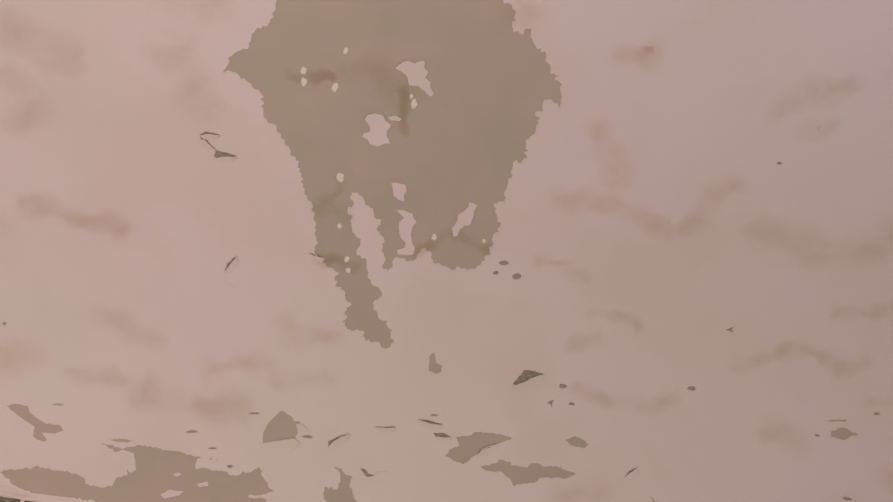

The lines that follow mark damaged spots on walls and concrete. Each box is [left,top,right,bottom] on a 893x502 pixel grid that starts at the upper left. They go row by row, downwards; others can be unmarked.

peeling [200,132,237,163]
peeling [220,0,564,350]
peeling [512,370,544,392]
peeling [4,401,65,444]
peeling [0,436,275,502]
peeling [261,411,314,453]
peeling [320,465,388,502]
peeling [417,413,578,488]